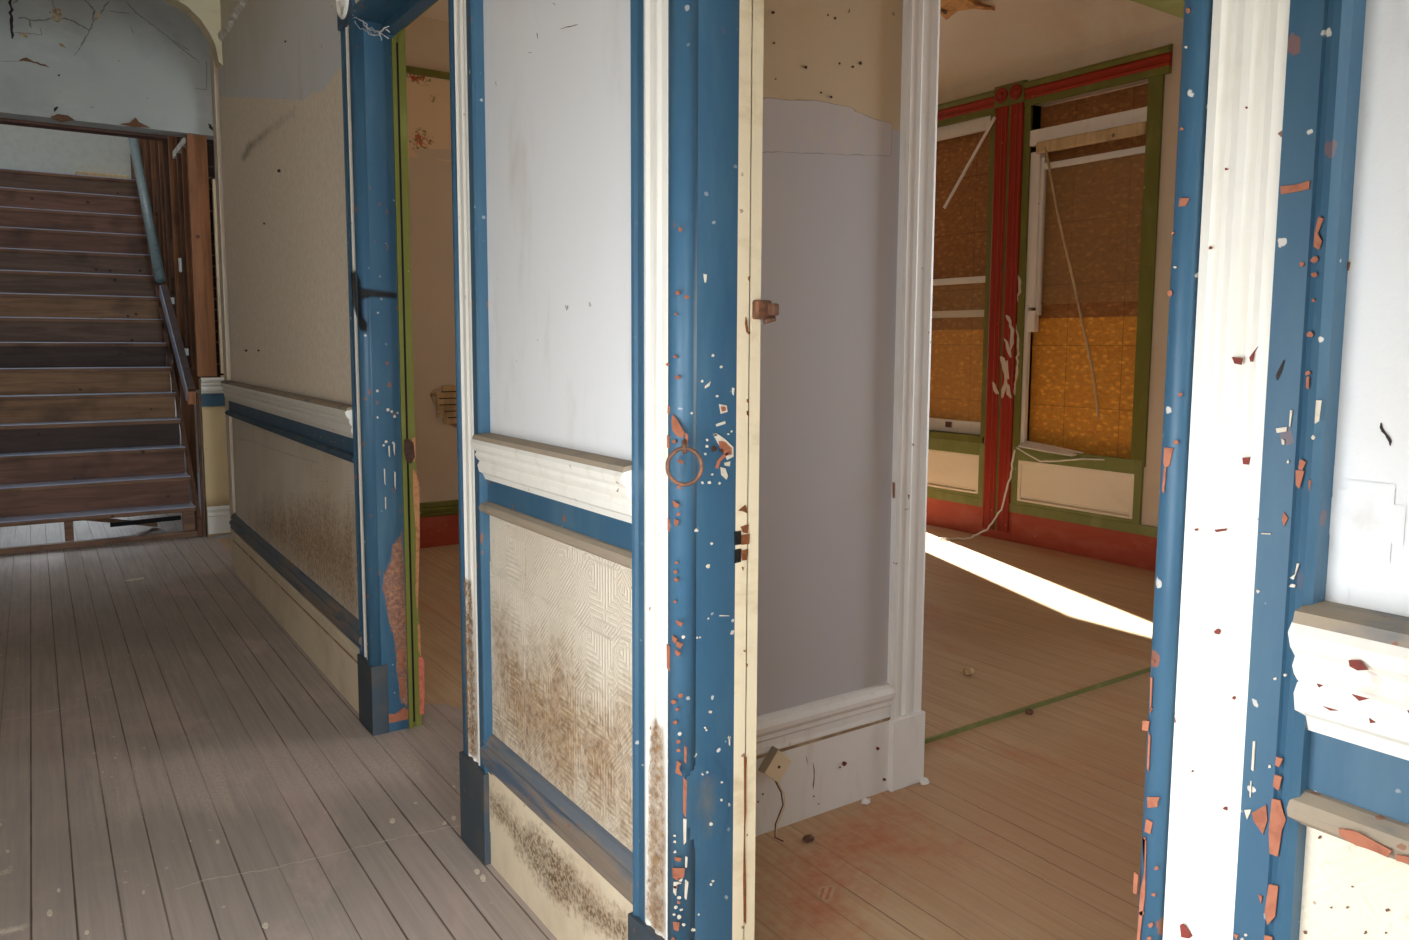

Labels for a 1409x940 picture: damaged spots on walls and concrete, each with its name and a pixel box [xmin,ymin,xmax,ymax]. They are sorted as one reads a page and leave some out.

crack [6,0,207,90]
peeling [701,354,735,485]
leakage [225,410,359,619]
peeling [383,437,424,723]
peeling [1349,660,1369,671]
leakage [464,562,664,940]
peeling [671,694,723,940]
leakage [686,756,728,853]
peeling [1133,797,1160,940]
peeling [1223,741,1286,857]
peeling [1234,884,1279,940]
peeling [1339,828,1409,864]